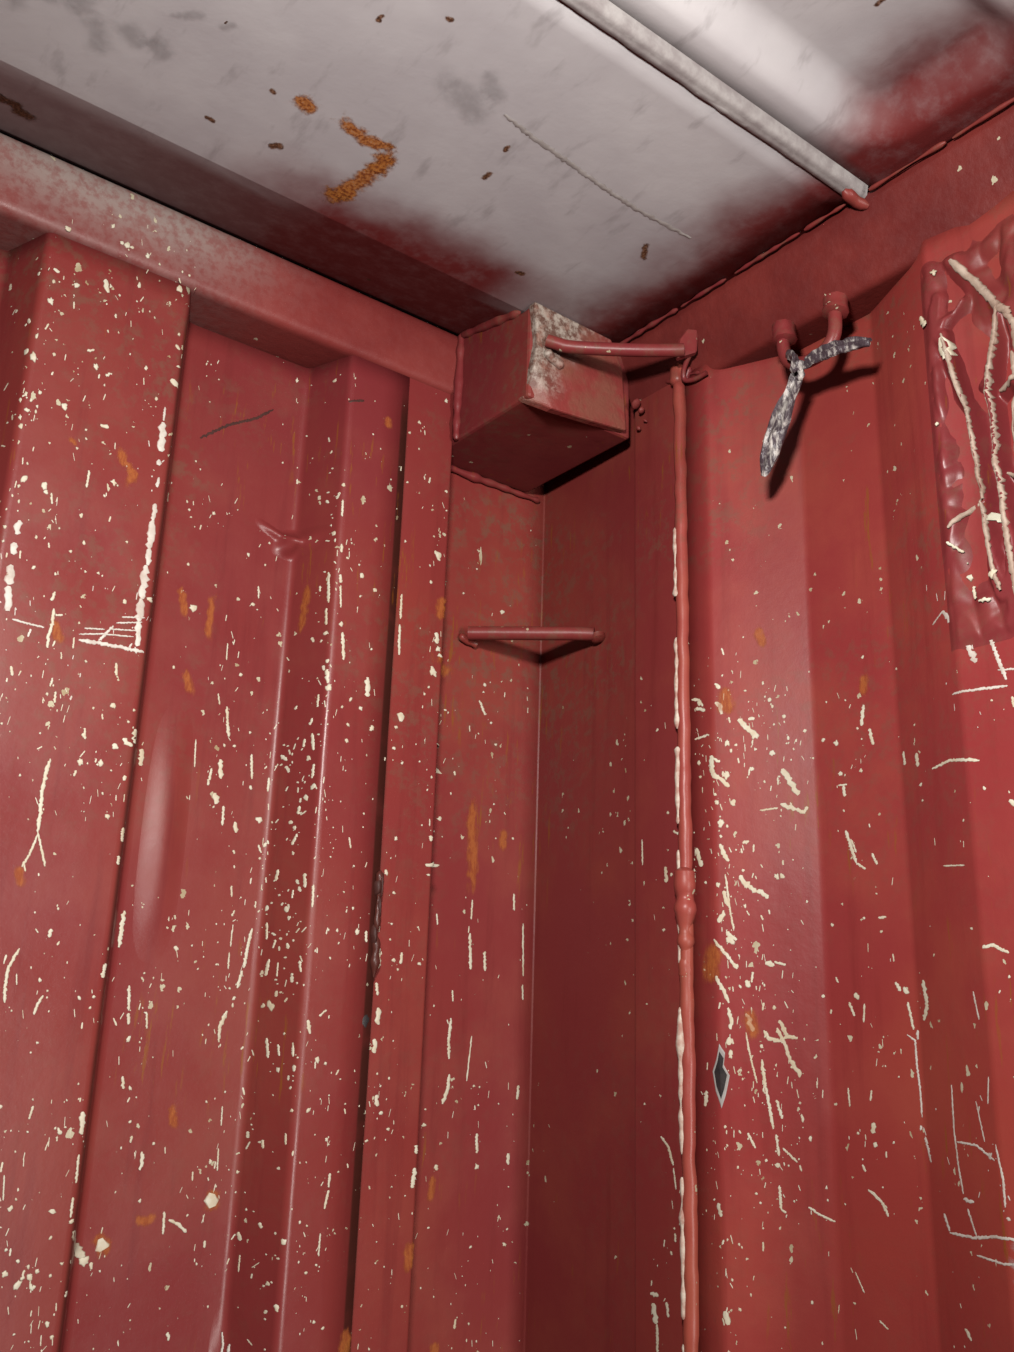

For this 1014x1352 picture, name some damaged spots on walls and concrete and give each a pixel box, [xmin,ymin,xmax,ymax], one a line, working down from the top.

corrosion [294,96,316,113]
corrosion [325,119,395,203]
peeling [0,381,109,574]
peeling [0,591,75,732]
peeling [946,640,1014,728]
peeling [64,709,144,865]
peeling [174,438,437,1089]
peeling [3,948,50,1019]
peeling [35,929,162,1064]
peeling [692,648,846,1224]
peeling [0,1082,128,1315]
peeling [162,1146,326,1301]